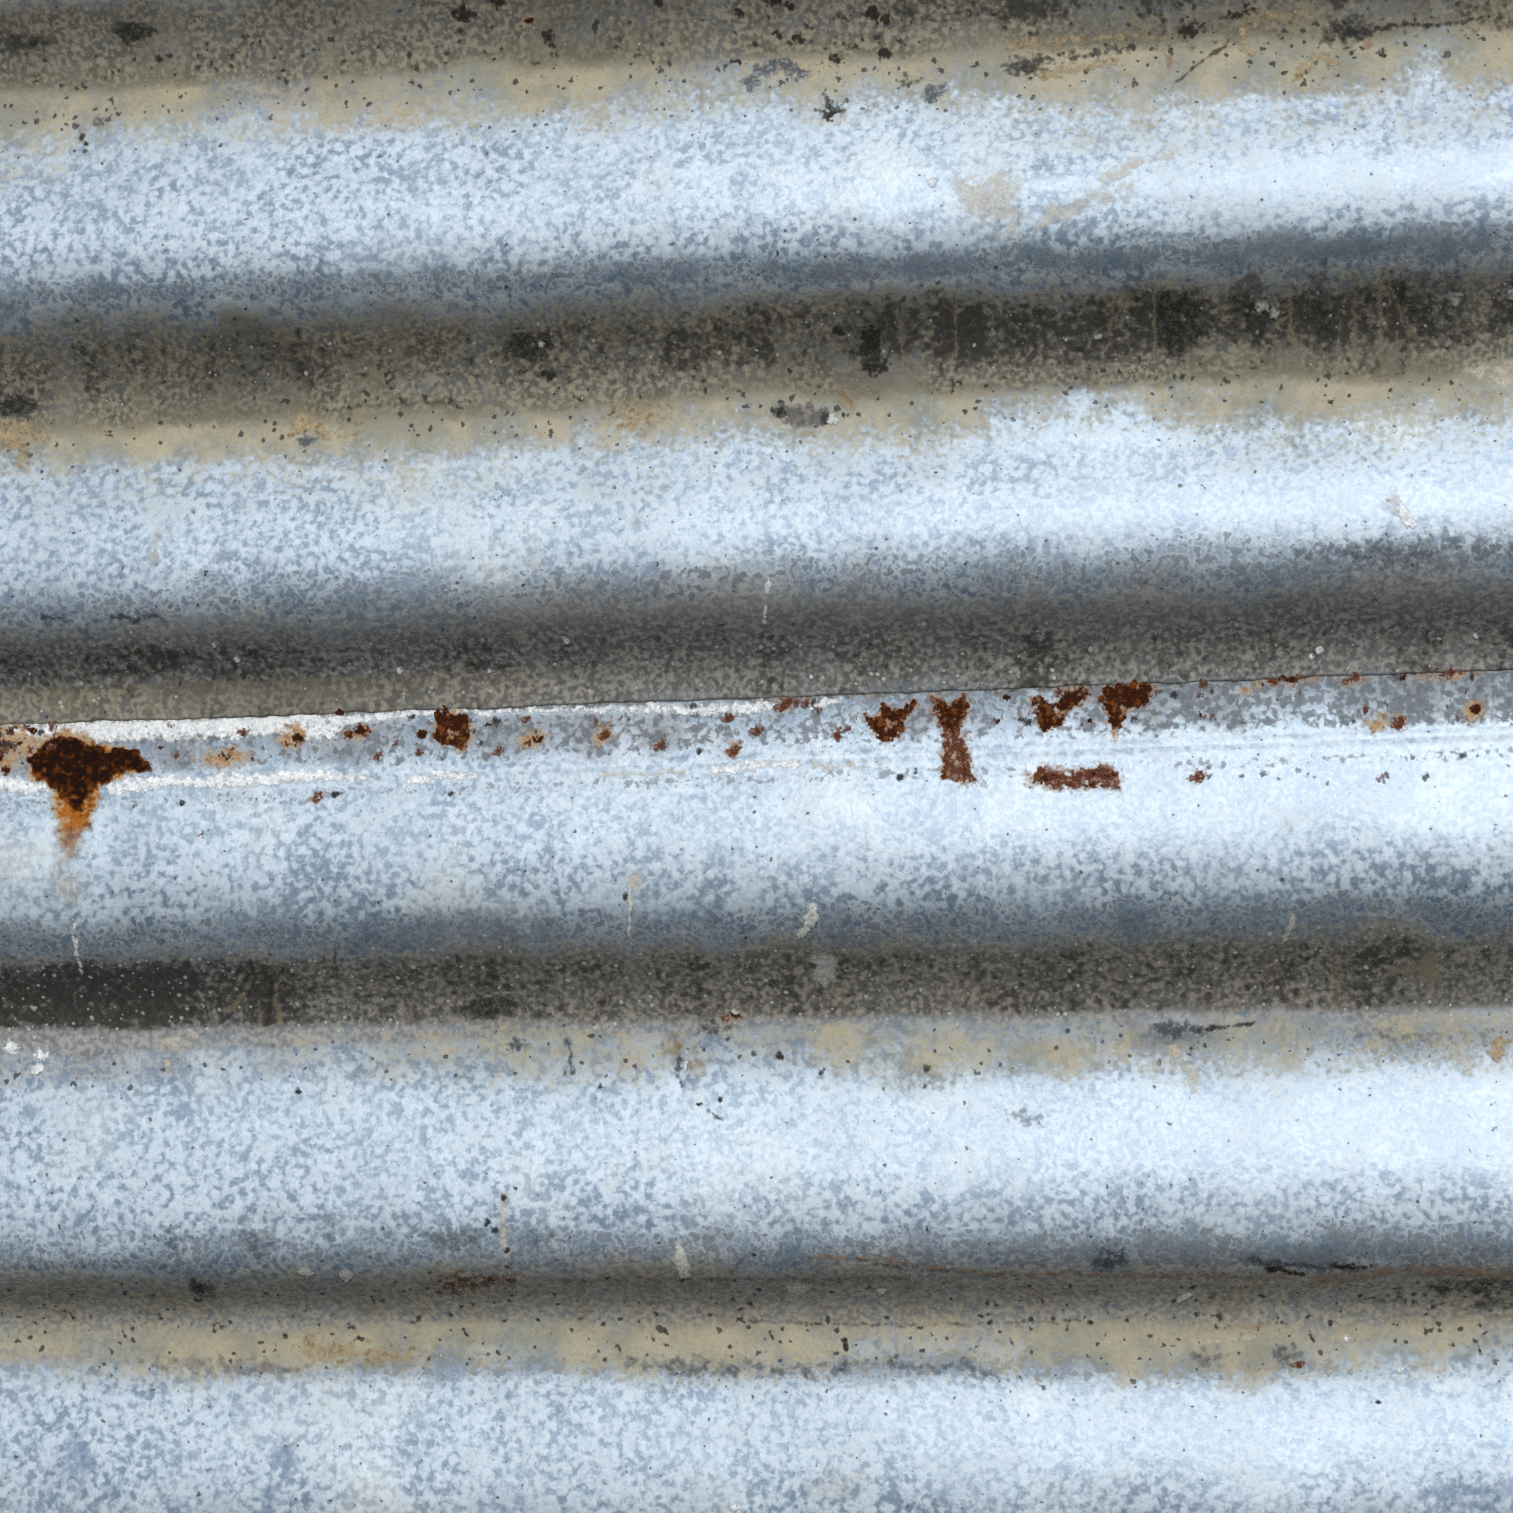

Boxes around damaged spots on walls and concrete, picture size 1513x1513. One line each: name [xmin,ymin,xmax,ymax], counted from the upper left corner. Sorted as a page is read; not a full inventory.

corrosion [0,696,855,846]
corrosion [833,692,986,786]
corrosion [1026,763,1121,792]
corrosion [993,678,1216,742]
corrosion [1187,768,1211,783]